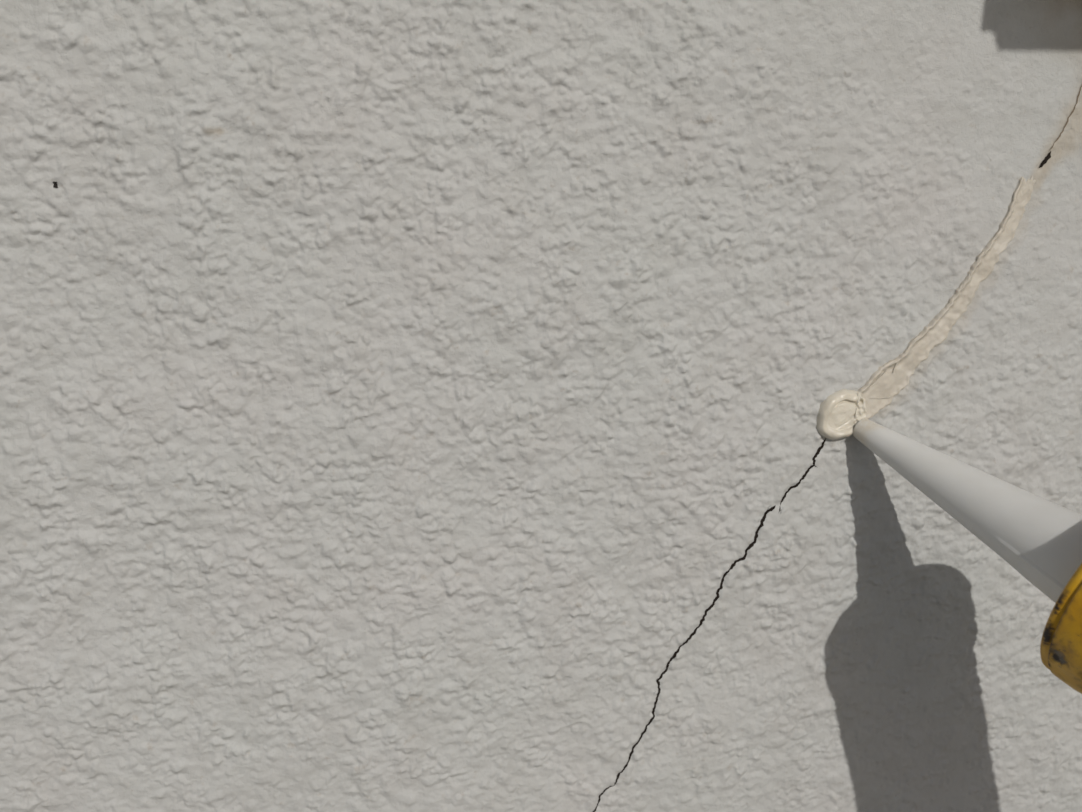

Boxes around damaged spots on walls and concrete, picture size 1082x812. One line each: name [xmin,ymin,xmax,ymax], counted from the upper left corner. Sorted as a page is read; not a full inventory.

crack [1039,85,1082,168]
crack [593,439,826,812]